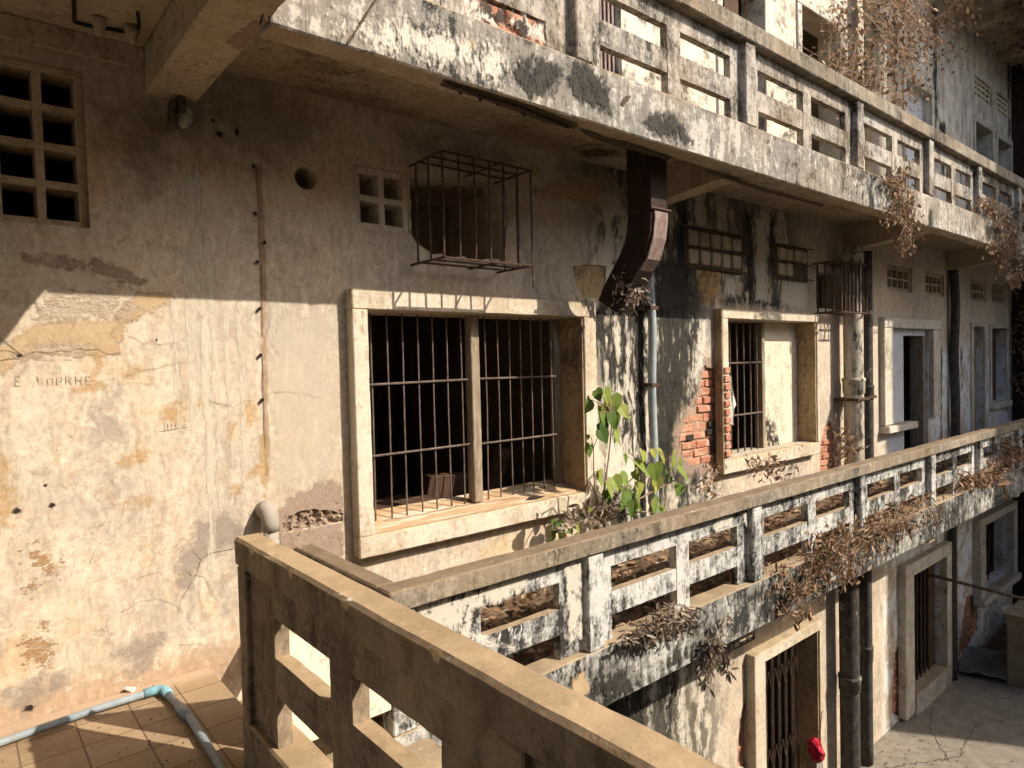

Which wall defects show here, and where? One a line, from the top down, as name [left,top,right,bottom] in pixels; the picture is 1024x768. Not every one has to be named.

water stain [327,0,616,116]
flaking render [464,0,543,45]
peeling [0,252,173,375]
crack [0,322,193,384]
water stain [577,210,811,509]
flaking render [671,349,732,485]
peeling [278,479,346,557]
crack [122,544,234,614]
water stain [415,575,528,638]
water stain [564,561,584,644]
water stain [656,646,694,747]
crack [886,706,1022,768]